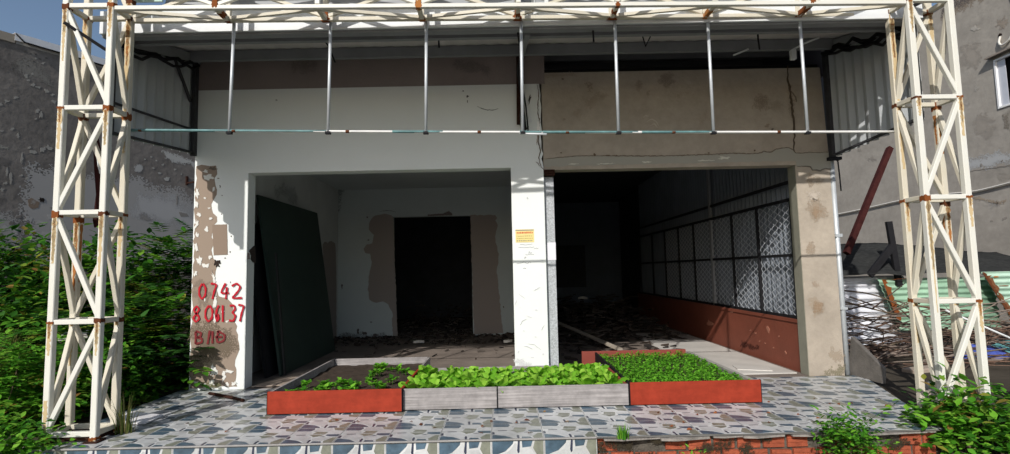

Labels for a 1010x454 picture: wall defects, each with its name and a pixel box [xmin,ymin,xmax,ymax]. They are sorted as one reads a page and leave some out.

corrosion [62,2,73,61]
corrosion [107,0,136,93]
corrosion [56,106,64,149]
corrosion [102,105,142,145]
crack [536,66,831,171]
corrosion [891,96,944,154]
corrosion [51,210,84,291]
corrosion [98,211,128,276]
flaking render [129,150,240,388]
flaking render [364,214,398,336]
flaking render [470,215,517,334]
corrosion [899,194,952,313]